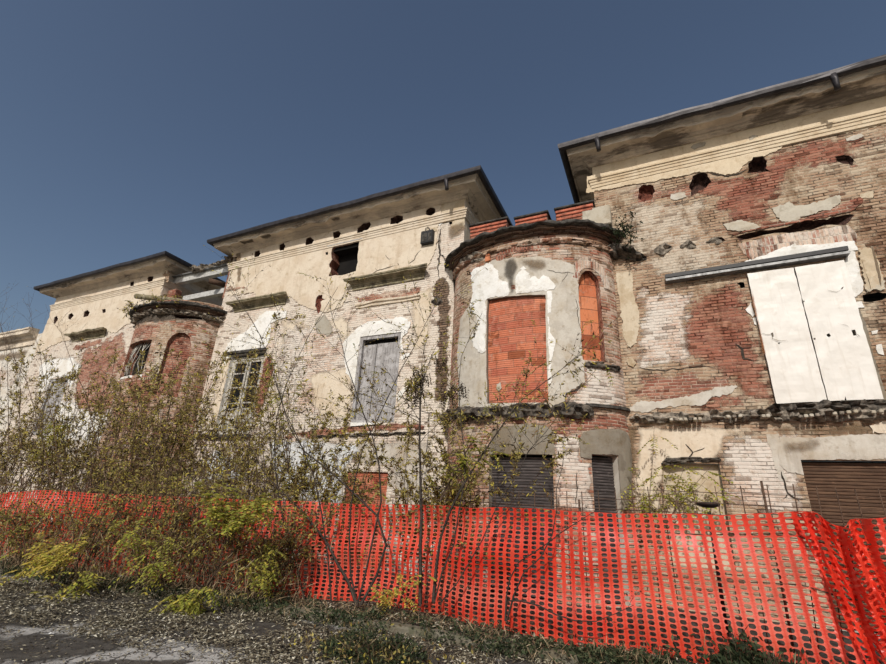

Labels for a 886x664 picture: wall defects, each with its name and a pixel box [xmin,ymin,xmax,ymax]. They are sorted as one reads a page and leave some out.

peeling [459,262,556,384]
damp [505,259,544,291]
flaking render [550,270,773,433]
flaking render [628,133,886,355]